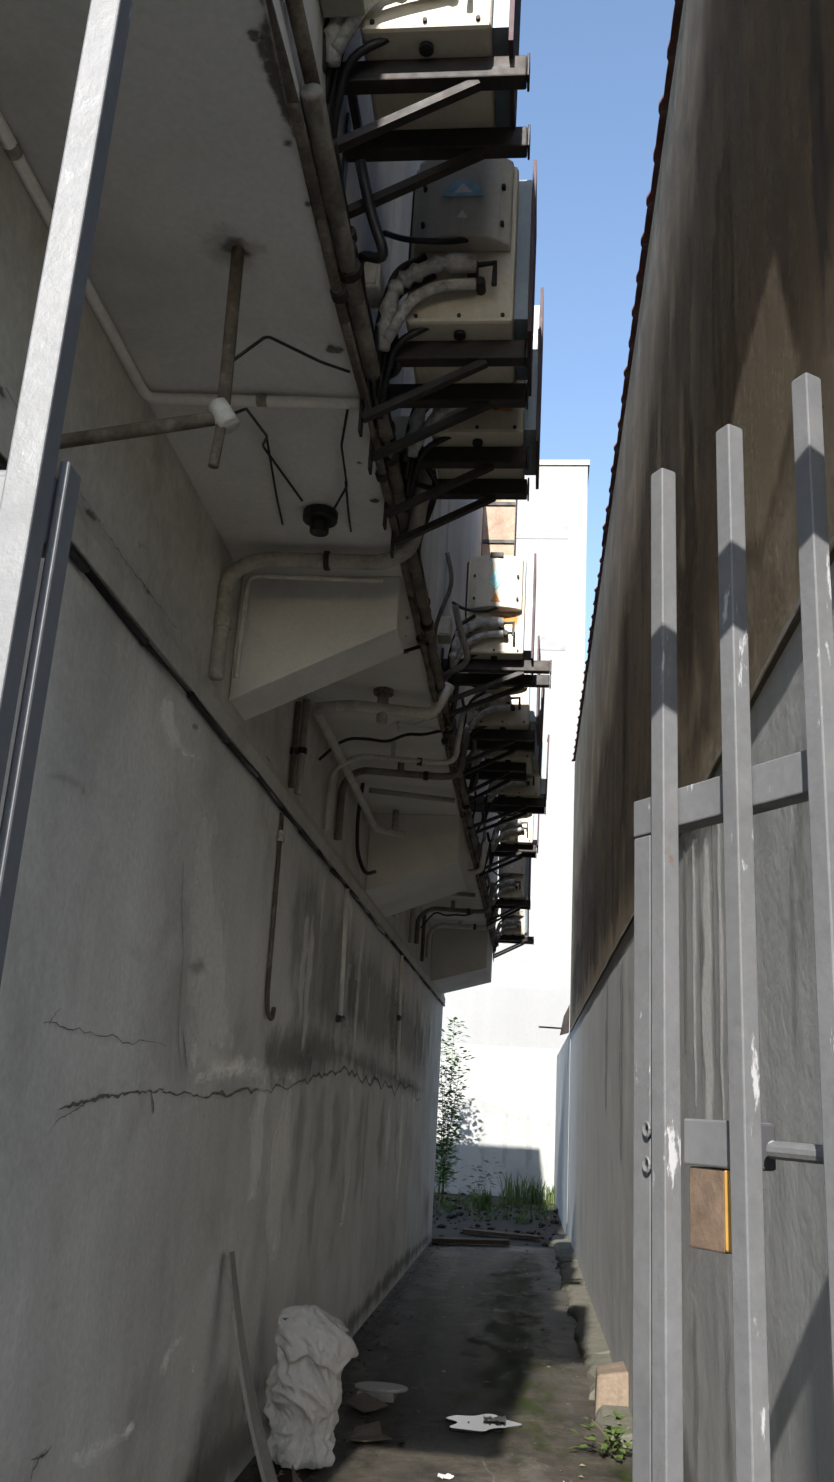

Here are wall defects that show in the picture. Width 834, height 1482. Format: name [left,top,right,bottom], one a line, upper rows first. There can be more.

leakage [572,0,834,1159]
crack [44,862,420,1133]
leakage [250,875,434,1253]